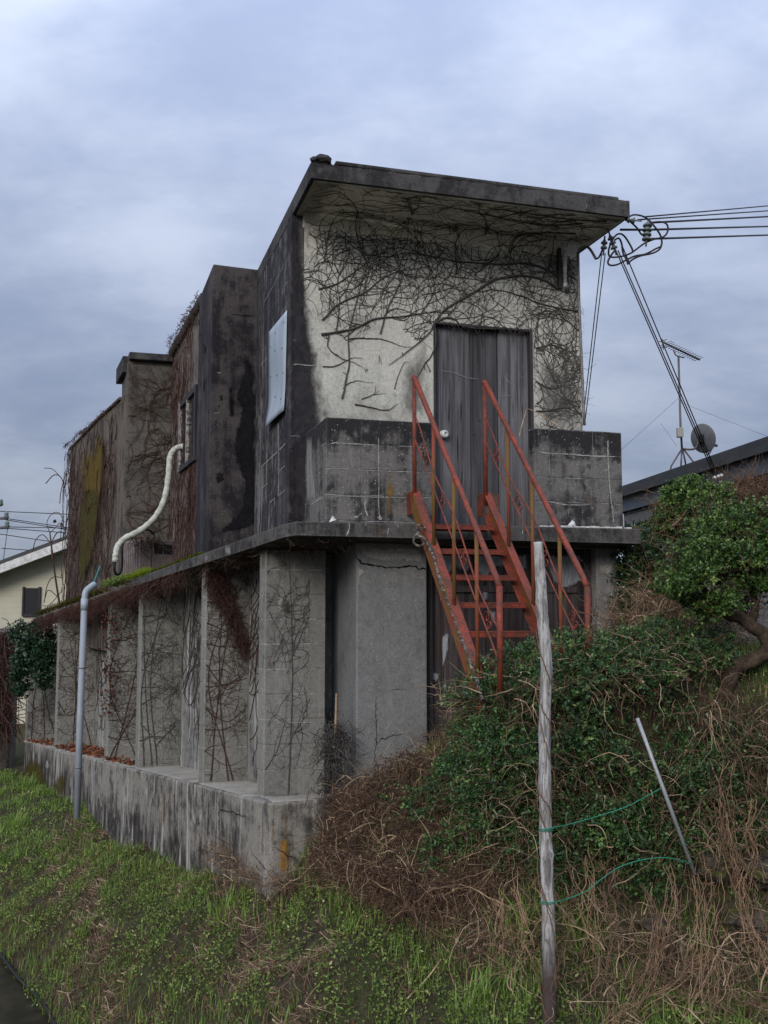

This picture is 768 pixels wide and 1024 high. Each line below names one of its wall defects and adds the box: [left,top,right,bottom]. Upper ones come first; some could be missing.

damp [223,359,285,532]
crack [356,556,426,570]
crack [357,696,410,774]